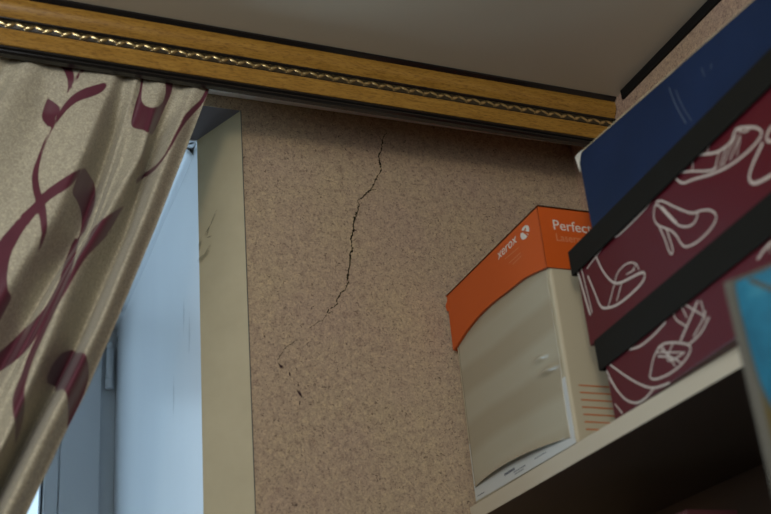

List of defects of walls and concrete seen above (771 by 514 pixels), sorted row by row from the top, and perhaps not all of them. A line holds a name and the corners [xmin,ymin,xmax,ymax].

crack [310,133,387,328]